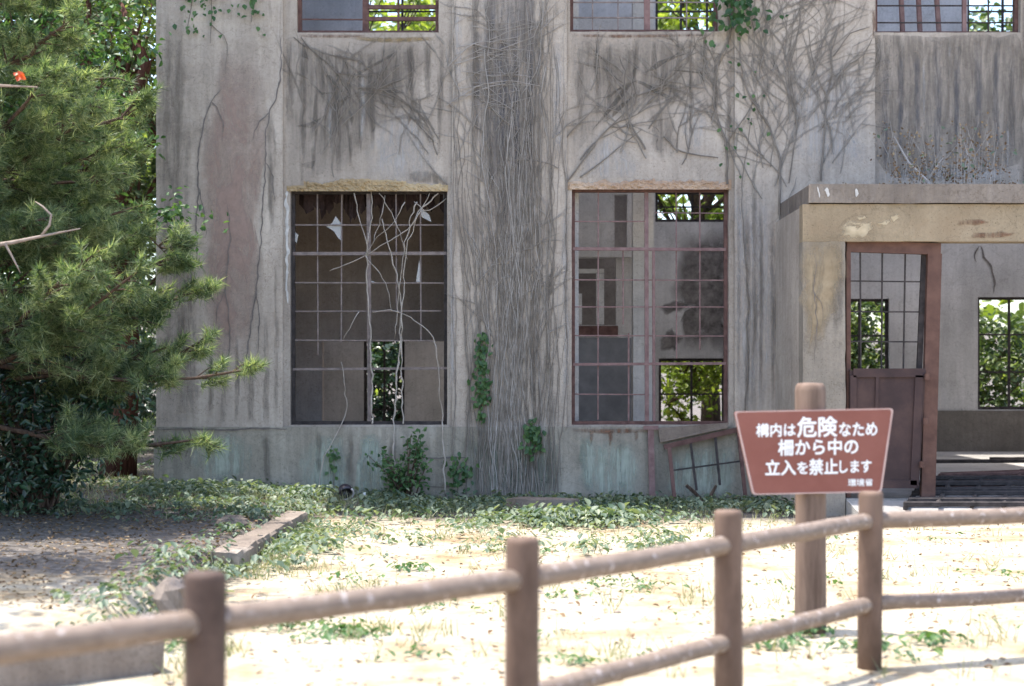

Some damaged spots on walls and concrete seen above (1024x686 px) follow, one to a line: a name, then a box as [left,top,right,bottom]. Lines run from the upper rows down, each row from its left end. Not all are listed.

damp [882,39,1017,177]
flaking render [843,214,899,238]
crack [974,247,996,292]